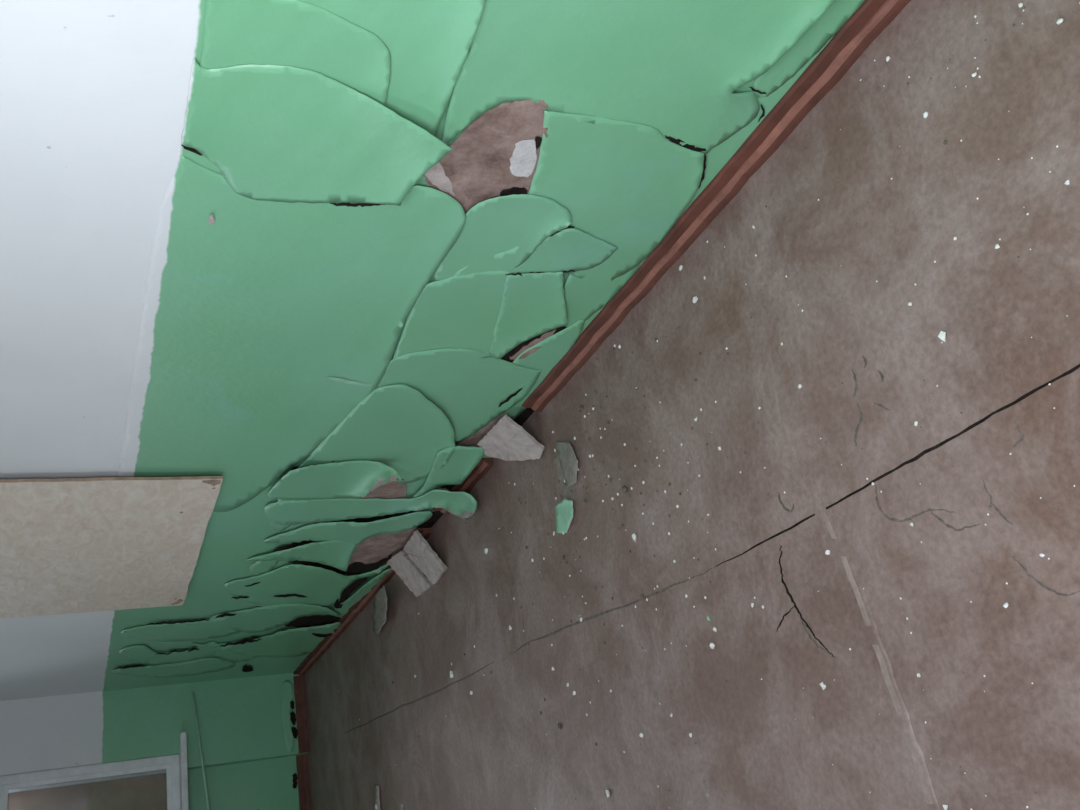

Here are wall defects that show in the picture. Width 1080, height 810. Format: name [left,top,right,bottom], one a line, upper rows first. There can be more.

peeling [111,0,865,678]
crack [344,355,1080,734]